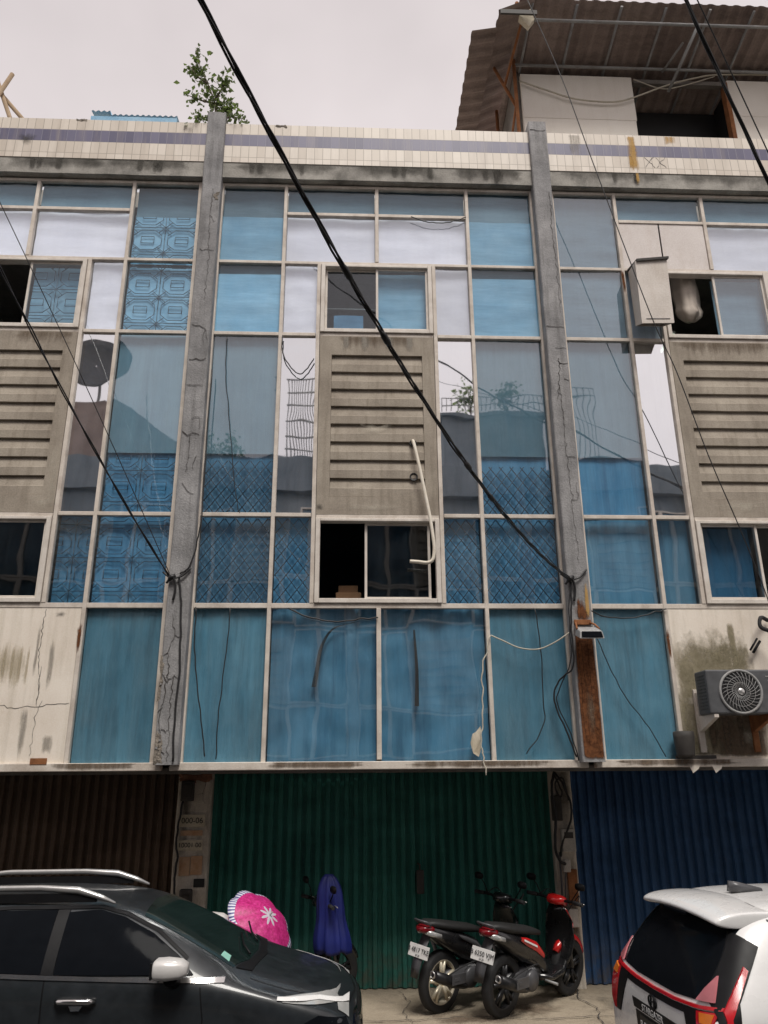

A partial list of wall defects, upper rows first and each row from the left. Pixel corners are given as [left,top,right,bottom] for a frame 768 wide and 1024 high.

damp [0,634,54,677]
crack [0,609,68,754]
crack [156,618,178,760]
rust [575,636,604,758]
damp [619,625,768,765]